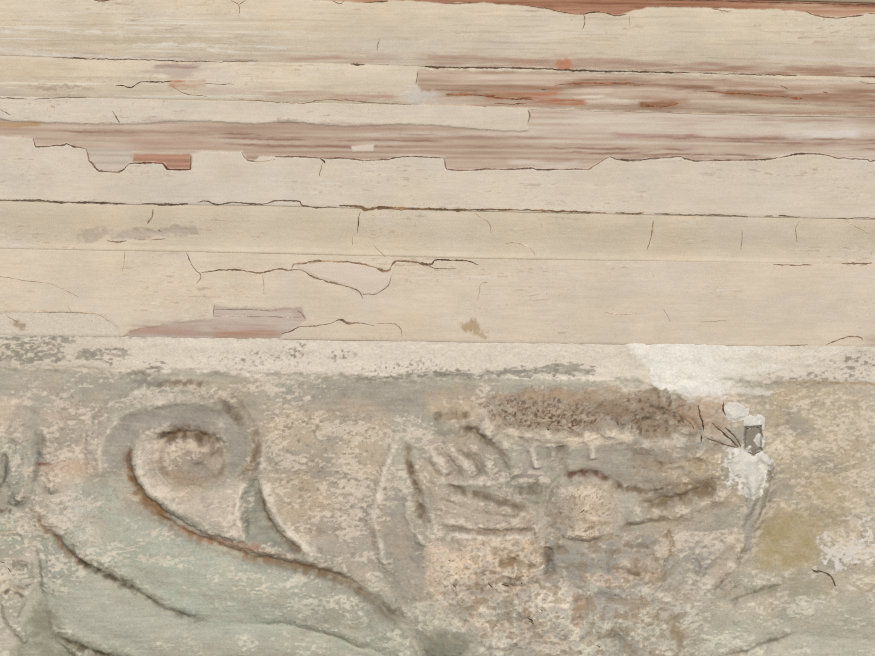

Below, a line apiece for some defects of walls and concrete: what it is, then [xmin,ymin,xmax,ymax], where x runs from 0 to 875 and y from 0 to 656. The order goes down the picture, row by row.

peeling [312,0,875,19]
peeling [0,45,875,173]
peeling [187,255,478,298]
flaking render [0,300,728,444]
leakage [666,381,785,402]
flaking render [411,475,624,638]